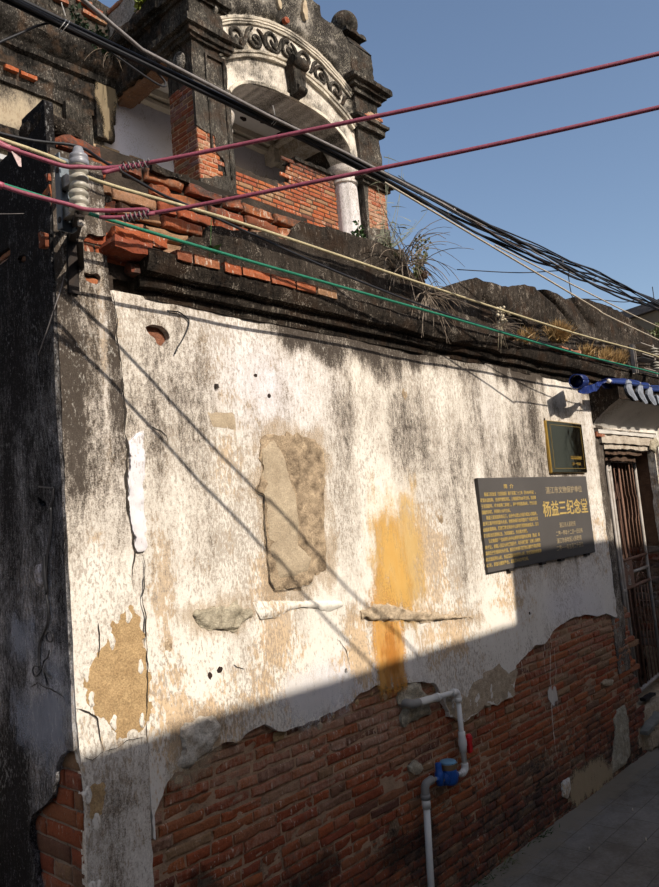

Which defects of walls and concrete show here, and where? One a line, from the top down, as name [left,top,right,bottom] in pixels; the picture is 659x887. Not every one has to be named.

spalling [169,86,225,181]
rust [369,481,426,610]
peeling [83,605,153,740]
rust [373,619,408,695]
spalling [151,606,647,887]
spalling [36,751,106,887]